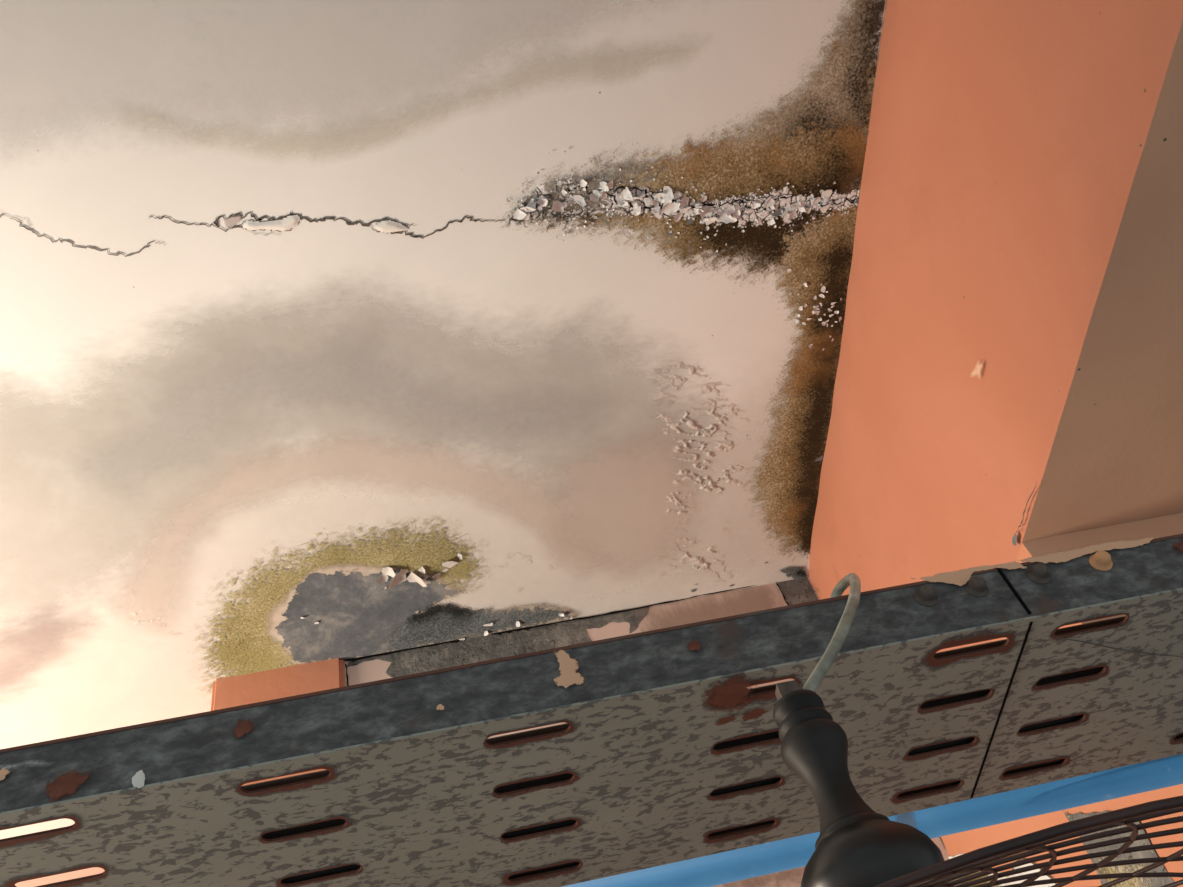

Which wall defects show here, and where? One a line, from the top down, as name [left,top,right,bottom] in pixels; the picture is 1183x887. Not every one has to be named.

crack [0,211,505,257]
water stain [506,0,885,580]
spalling [268,553,650,678]
corrosion [702,673,803,725]
corrosion [45,769,89,801]
corrosion [0,815,82,850]
peeling [959,858,1056,887]